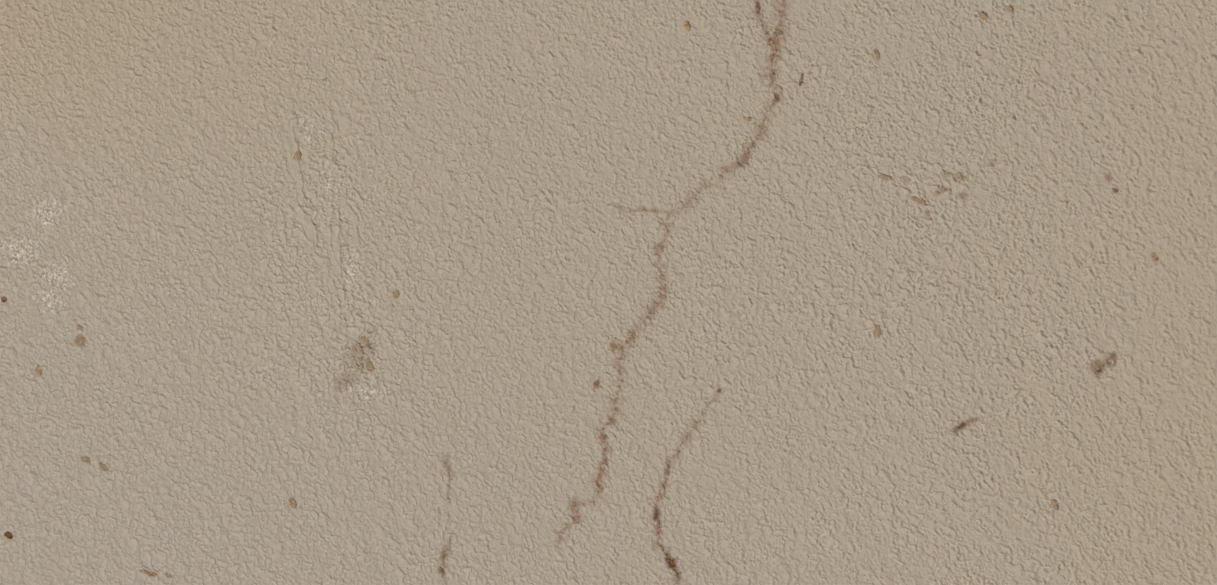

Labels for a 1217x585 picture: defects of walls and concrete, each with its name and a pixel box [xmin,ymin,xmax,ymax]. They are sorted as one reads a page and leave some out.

crack [549,0,795,551]
crack [646,385,723,585]